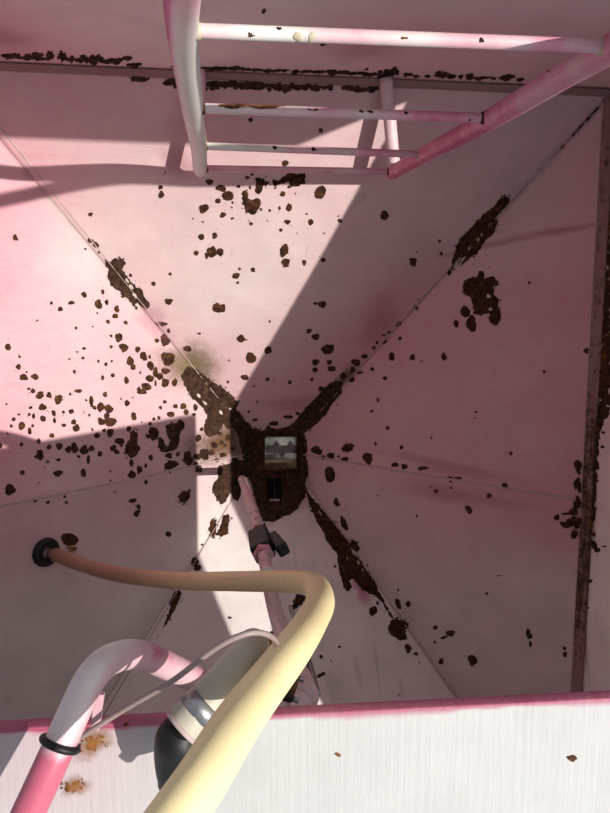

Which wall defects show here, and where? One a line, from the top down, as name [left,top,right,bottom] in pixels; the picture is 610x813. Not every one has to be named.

corrosion [1,50,150,82]
corrosion [200,66,524,94]
corrosion [192,160,306,267]
corrosion [314,185,326,199]
corrosion [438,194,510,276]
corrosion [47,238,150,325]
corrosion [212,298,225,313]
corrosion [453,267,502,332]
corrosion [590,209,610,553]
corrosion [5,321,421,664]
corrosion [551,460,582,539]
corrosion [60,778,85,793]